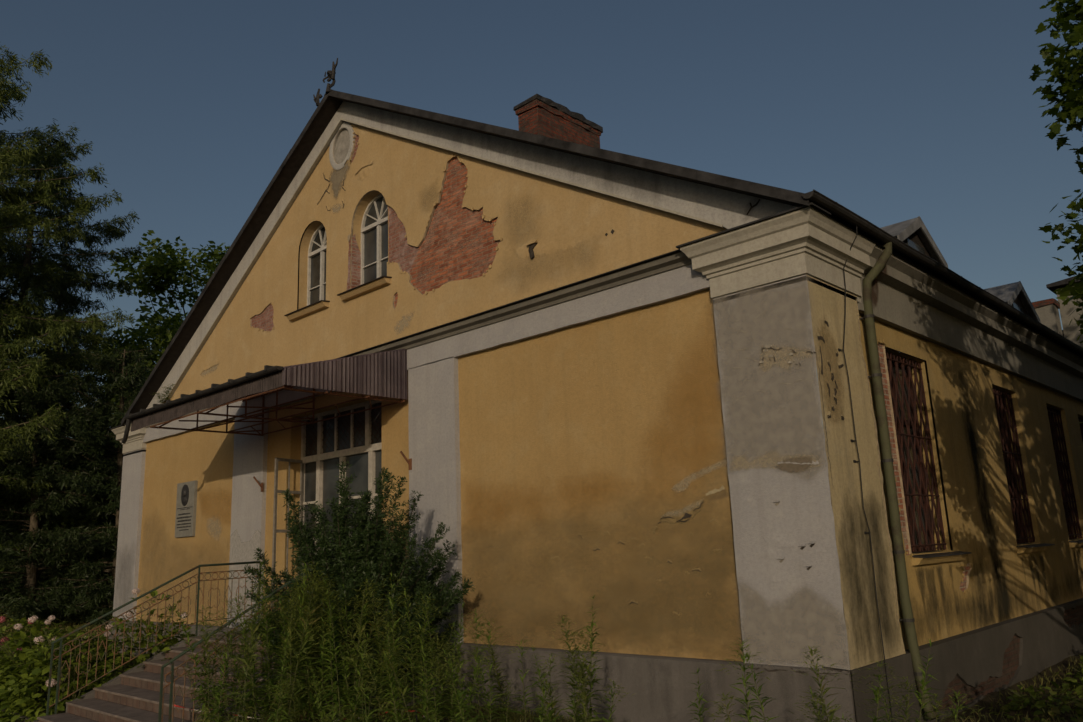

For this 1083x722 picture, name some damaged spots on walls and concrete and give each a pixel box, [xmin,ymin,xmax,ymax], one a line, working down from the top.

spalling [326,132,377,291]
spalling [388,154,503,295]
spalling [250,302,274,332]
peeling [674,453,819,491]
damp [850,509,890,644]
damp [964,394,1017,619]